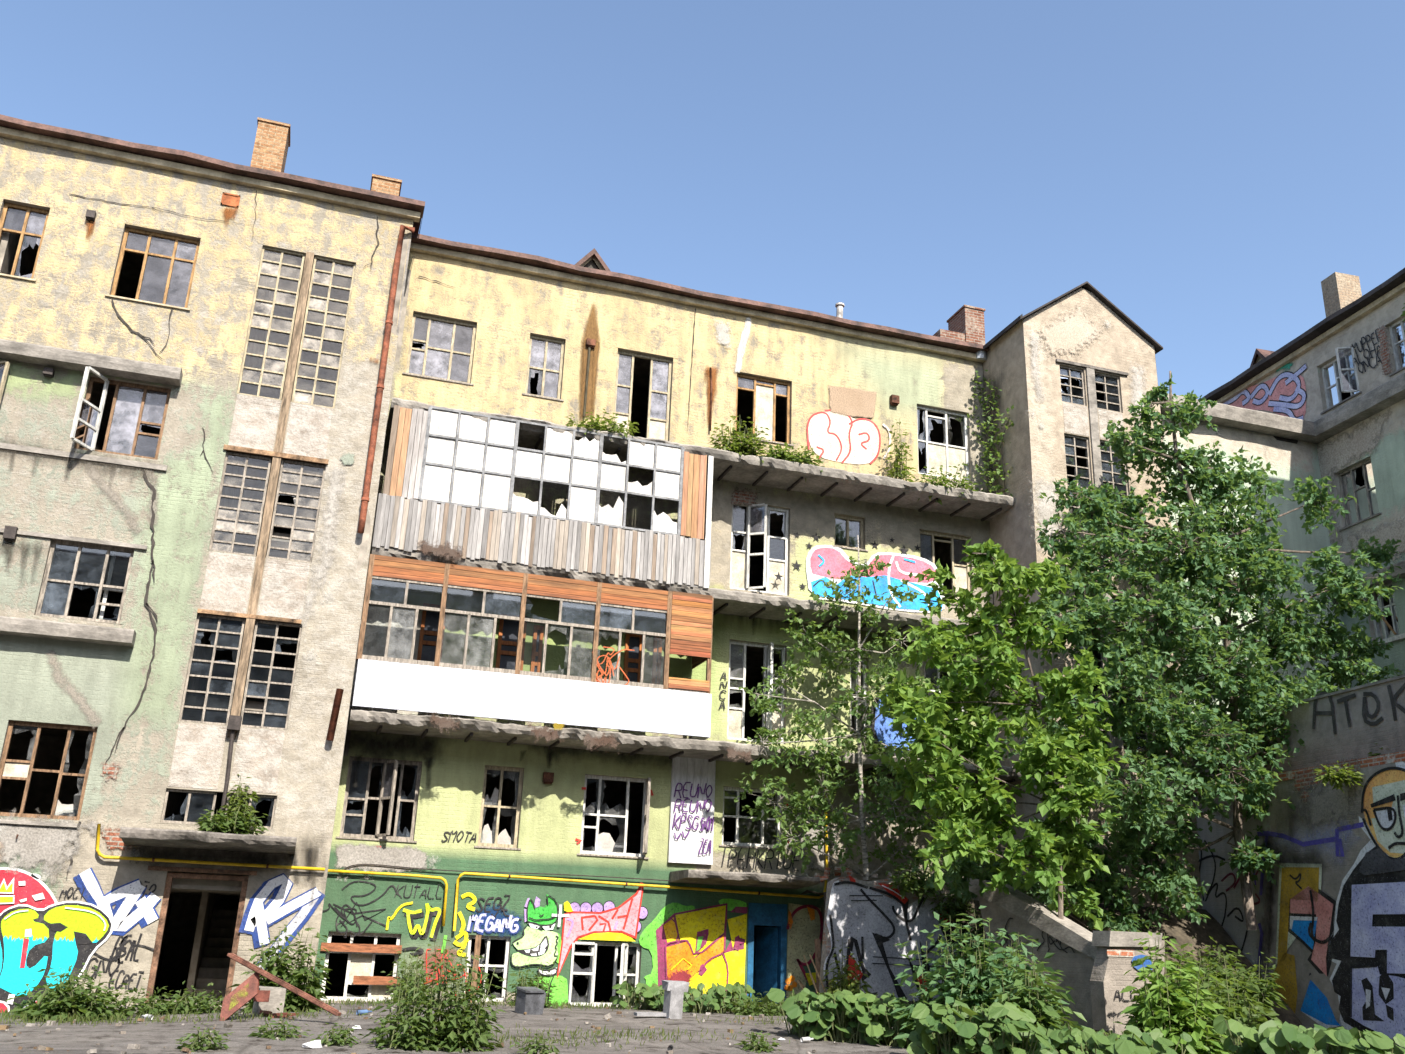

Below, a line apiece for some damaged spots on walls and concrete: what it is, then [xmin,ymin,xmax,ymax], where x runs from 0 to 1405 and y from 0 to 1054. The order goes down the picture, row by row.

crack [112,299,173,359]
crack [48,468,158,764]